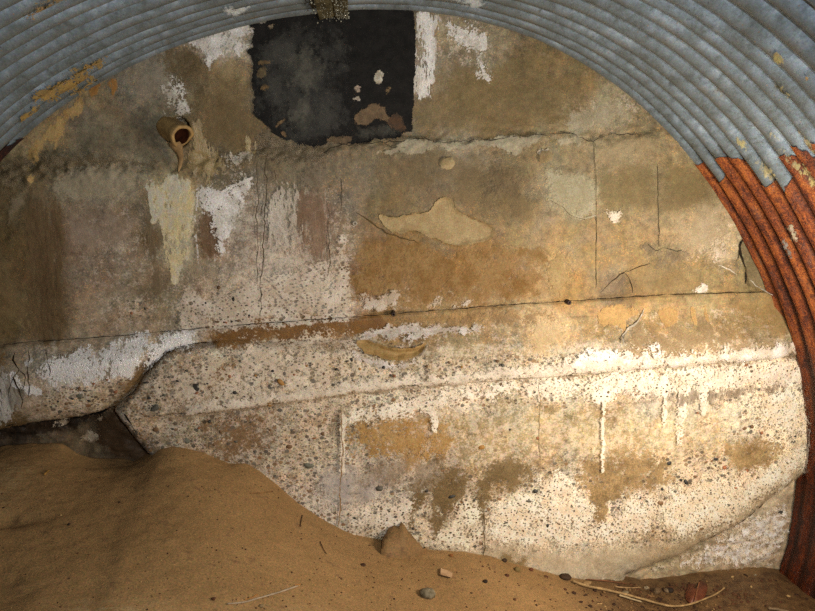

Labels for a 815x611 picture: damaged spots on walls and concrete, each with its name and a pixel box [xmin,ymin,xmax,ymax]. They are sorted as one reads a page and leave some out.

rust [0,138,24,162]
water stain [145,25,256,301]
crack [4,155,772,439]
water stain [0,98,811,577]
water stain [413,12,491,100]
crack [322,132,641,159]
rust [694,144,815,599]